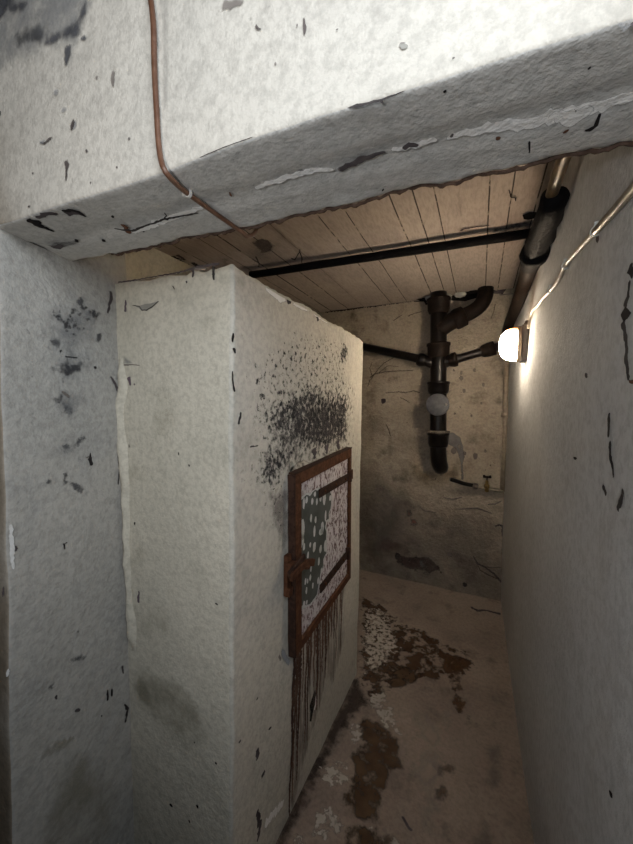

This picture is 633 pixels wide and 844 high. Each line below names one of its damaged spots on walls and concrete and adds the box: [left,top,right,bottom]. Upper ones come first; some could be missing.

water stain [0,0,86,65]
water stain [53,298,97,341]
rust [289,588,344,817]
water stain [344,719,403,844]